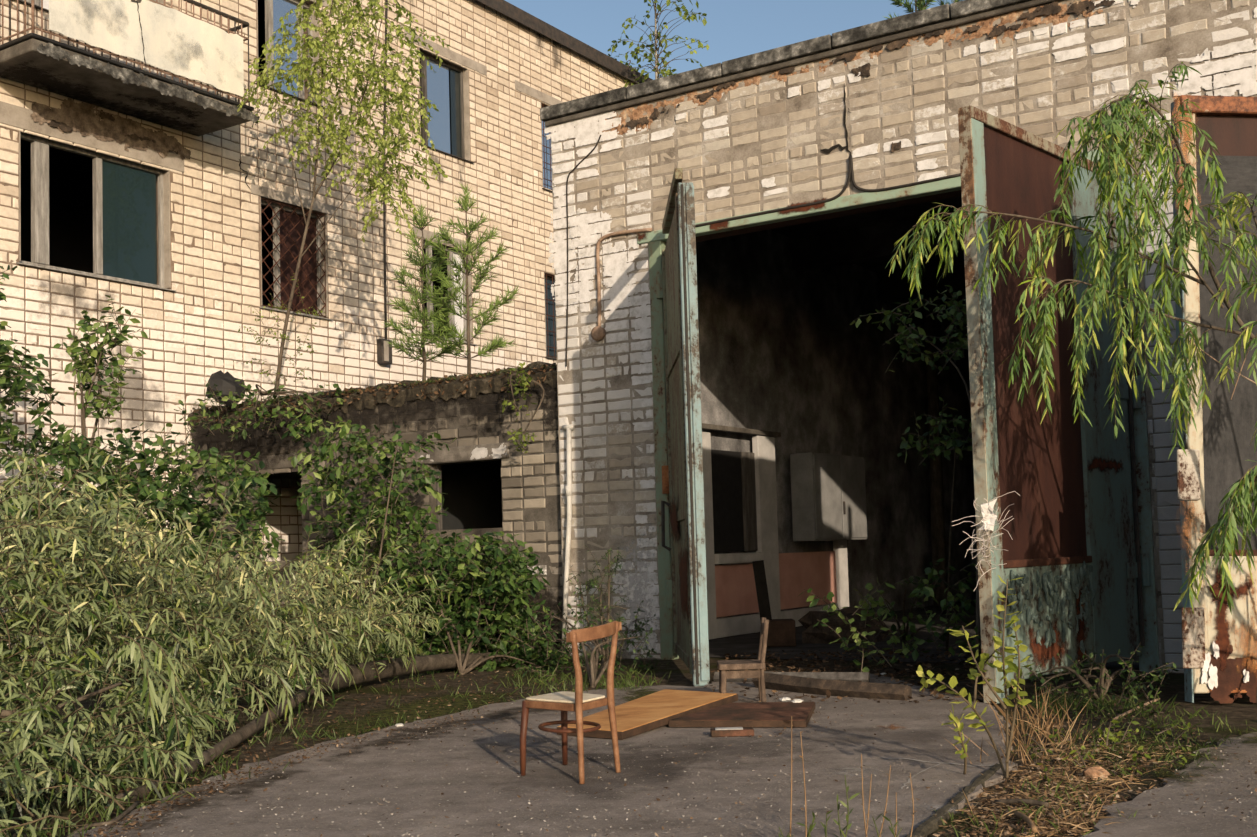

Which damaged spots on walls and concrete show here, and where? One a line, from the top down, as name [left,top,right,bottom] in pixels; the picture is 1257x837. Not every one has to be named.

peeling [1168,38,1257,97]
spalling [30,98,191,161]
peeling [544,0,1140,428]
peeling [640,444,655,489]
corrosion [1088,456,1123,473]
corrosion [669,500,689,623]
corrosion [1029,582,1088,672]
corrosion [1208,548,1257,671]